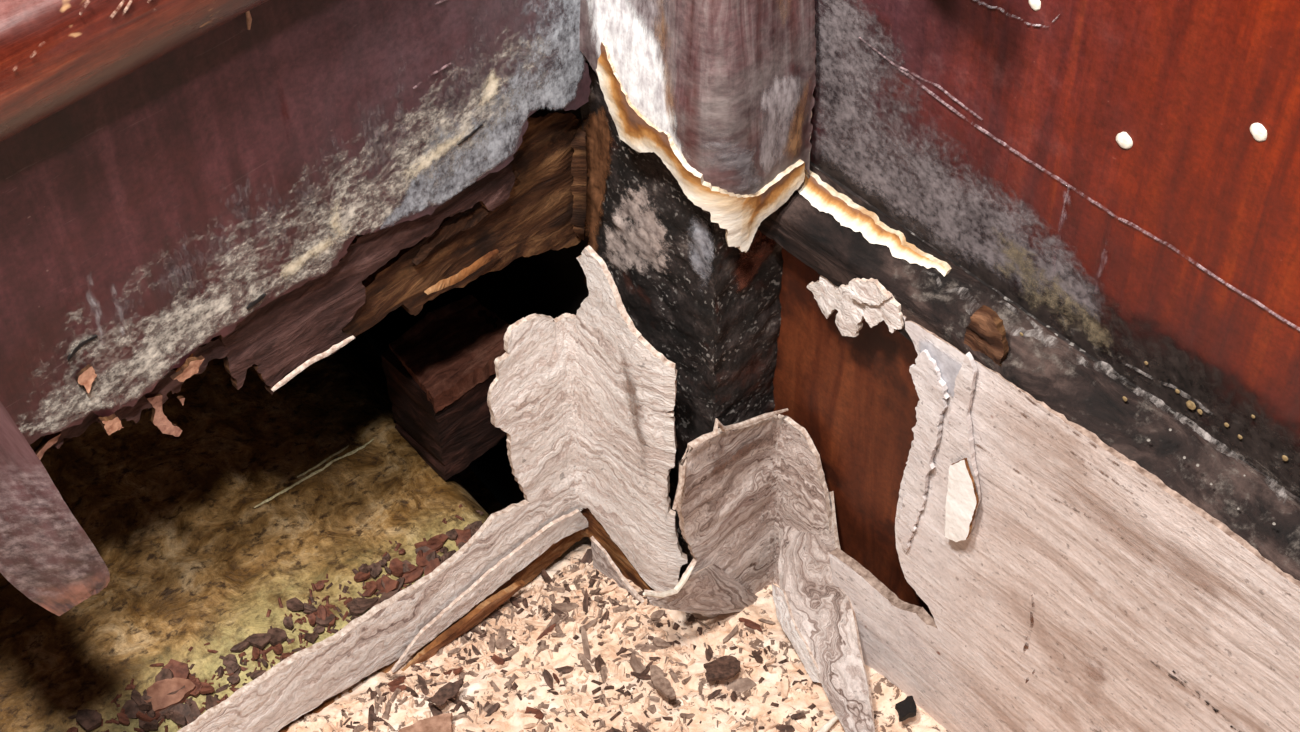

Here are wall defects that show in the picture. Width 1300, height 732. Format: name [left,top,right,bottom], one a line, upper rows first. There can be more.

leakage [716,78,800,194]
leakage [19,0,681,431]
leakage [689,219,714,279]
leakage [813,0,1300,498]
peeling [807,275,904,337]
leakage [626,374,645,442]
peeling [703,655,741,683]